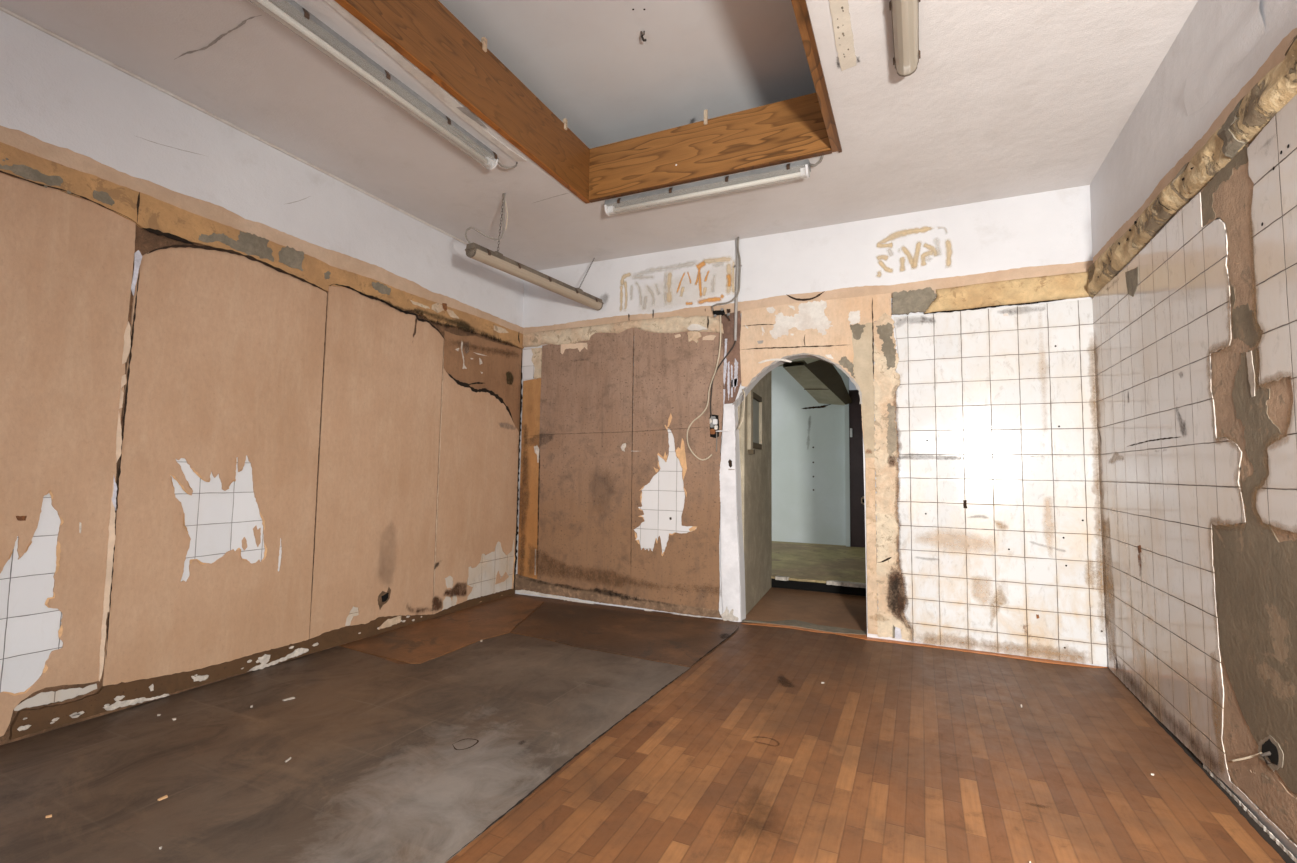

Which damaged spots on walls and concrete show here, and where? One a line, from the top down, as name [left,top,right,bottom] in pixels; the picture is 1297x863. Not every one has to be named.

crack [174,15,261,60]
peeling [410,300,542,431]
flaking render [1200,144,1293,589]
peeling [0,490,97,731]
peeling [103,684,176,720]
peeling [170,456,282,582]
peeling [241,642,318,672]
peeling [442,541,593,610]
peeling [634,414,697,556]
leakage [887,572,904,621]
flaking render [1217,612,1297,845]
flaking render [1271,525,1297,542]